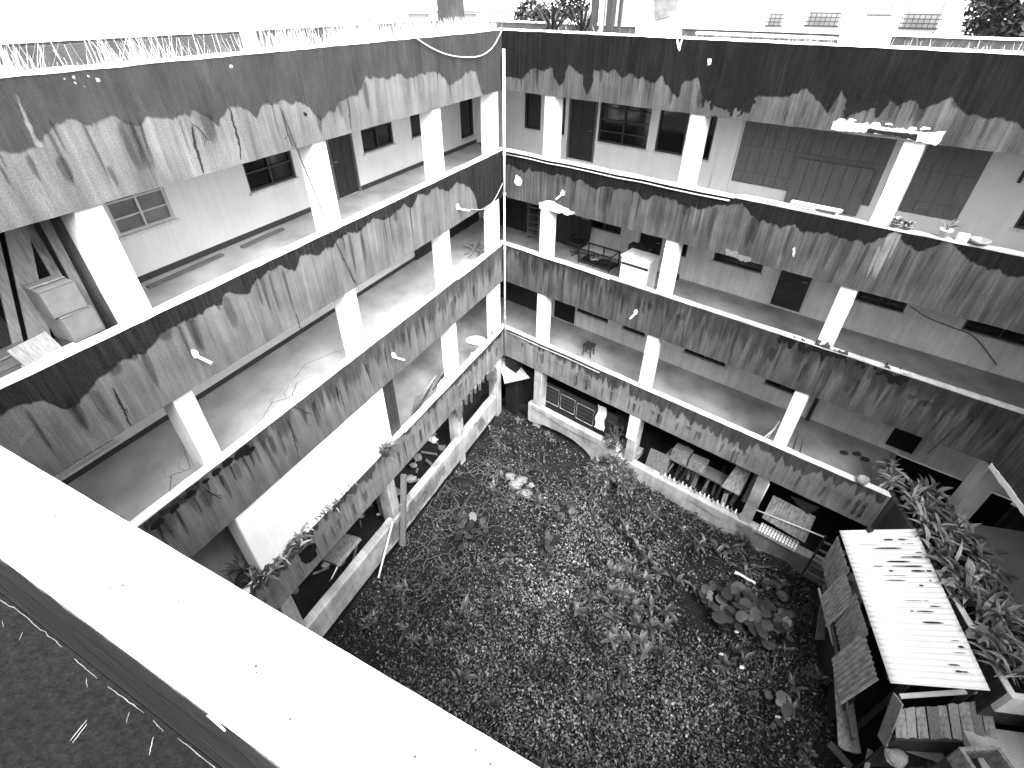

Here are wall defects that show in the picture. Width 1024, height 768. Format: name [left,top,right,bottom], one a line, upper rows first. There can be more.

crack [191,123,208,173]
crack [229,107,241,159]
water stain [0,30,1024,153]
water stain [0,150,1024,415]
crack [113,388,131,427]
crack [262,349,344,460]
water stain [403,329,504,434]
water stain [519,336,887,503]
water stain [249,447,390,595]